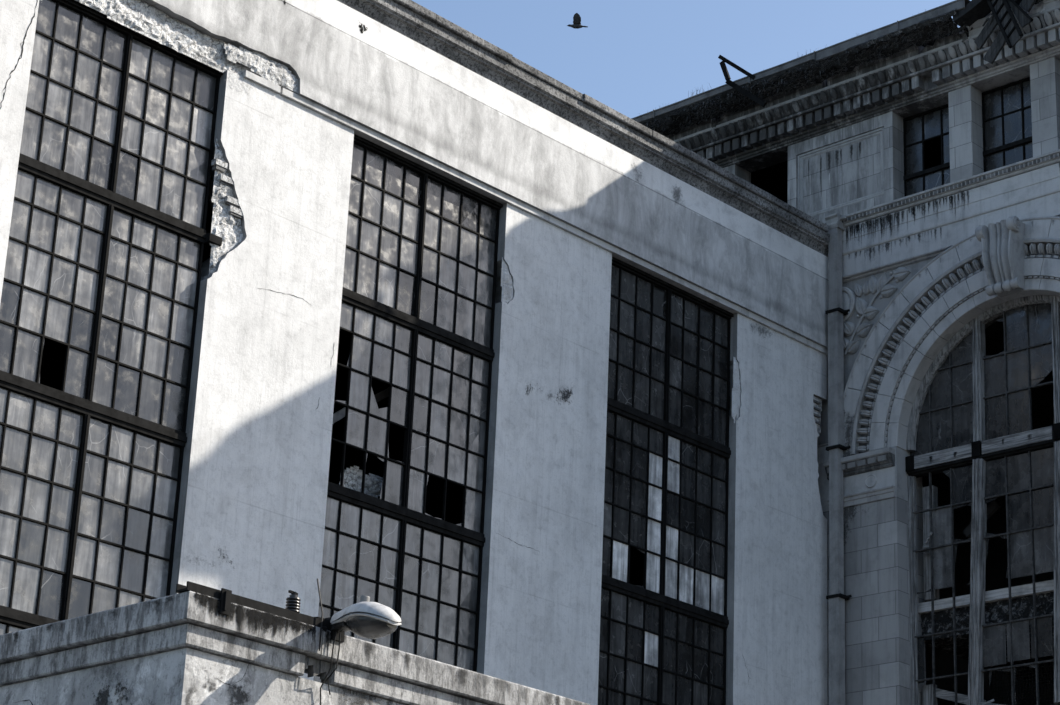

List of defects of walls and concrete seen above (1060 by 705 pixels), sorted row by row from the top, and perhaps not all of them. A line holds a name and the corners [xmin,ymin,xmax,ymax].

crack [0,0,38,109]
spalling [76,0,298,95]
spalling [208,139,243,277]
leakage [846,191,969,258]
spalling [501,257,513,304]
spalling [732,357,740,423]
leakage [94,669,128,705]
leakage [180,670,248,705]
leakage [339,687,392,705]